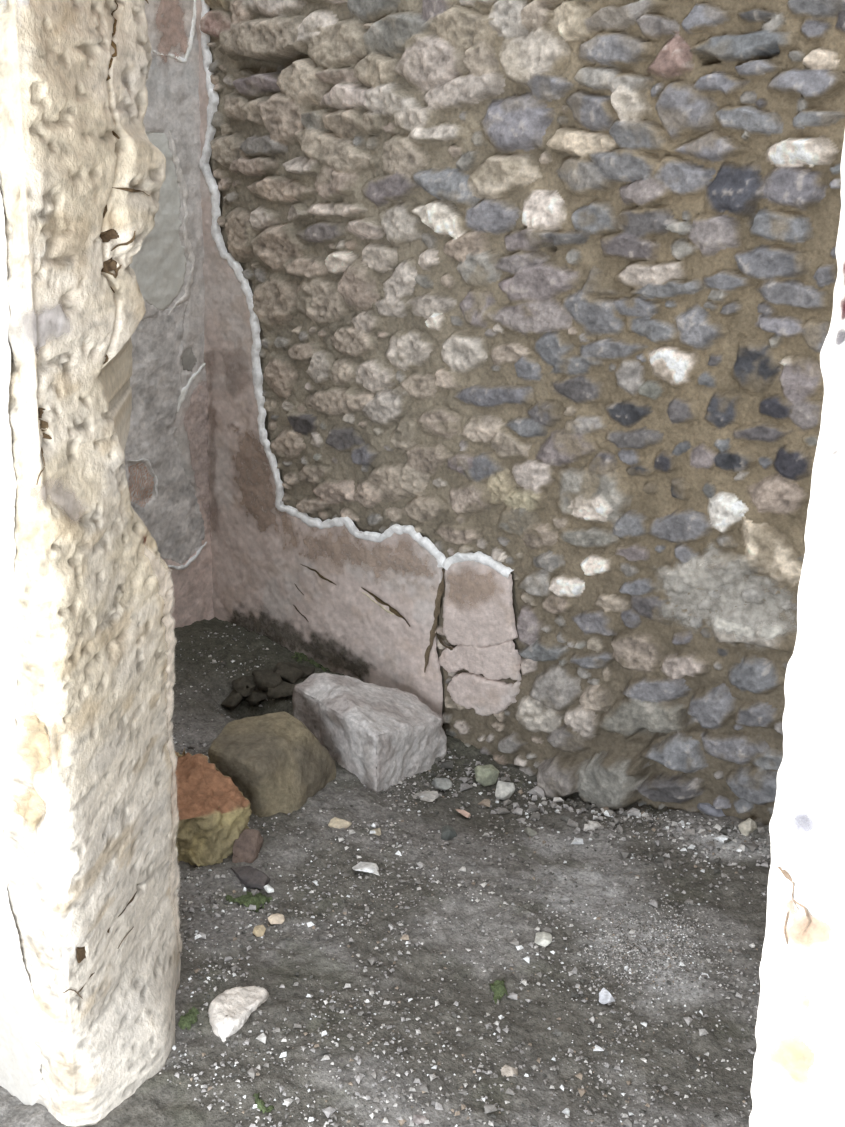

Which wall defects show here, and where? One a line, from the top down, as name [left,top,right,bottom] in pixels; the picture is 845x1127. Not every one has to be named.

crack [106,0,118,81]
flaking render [99,0,521,952]
crack [293,564,453,673]
leakage [782,900,831,949]
leakage [767,1035,815,1086]